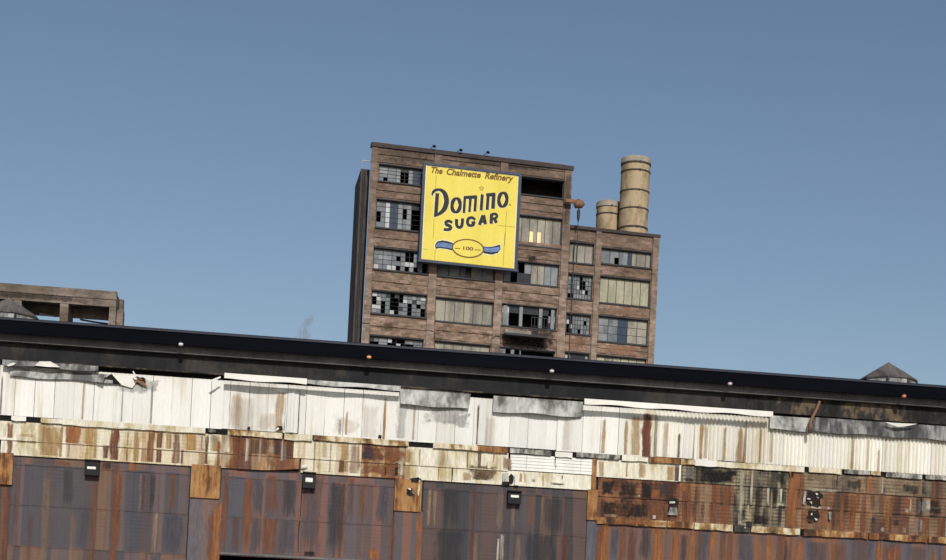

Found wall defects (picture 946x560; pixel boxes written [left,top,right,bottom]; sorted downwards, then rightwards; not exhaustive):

rust [41,385,300,560]
rust [416,490,437,560]
water stain [428,407,469,427]
rust [624,414,657,478]
rust [723,422,747,462]
rust [758,474,804,560]
peeling [803,489,835,522]
rust [823,479,944,560]